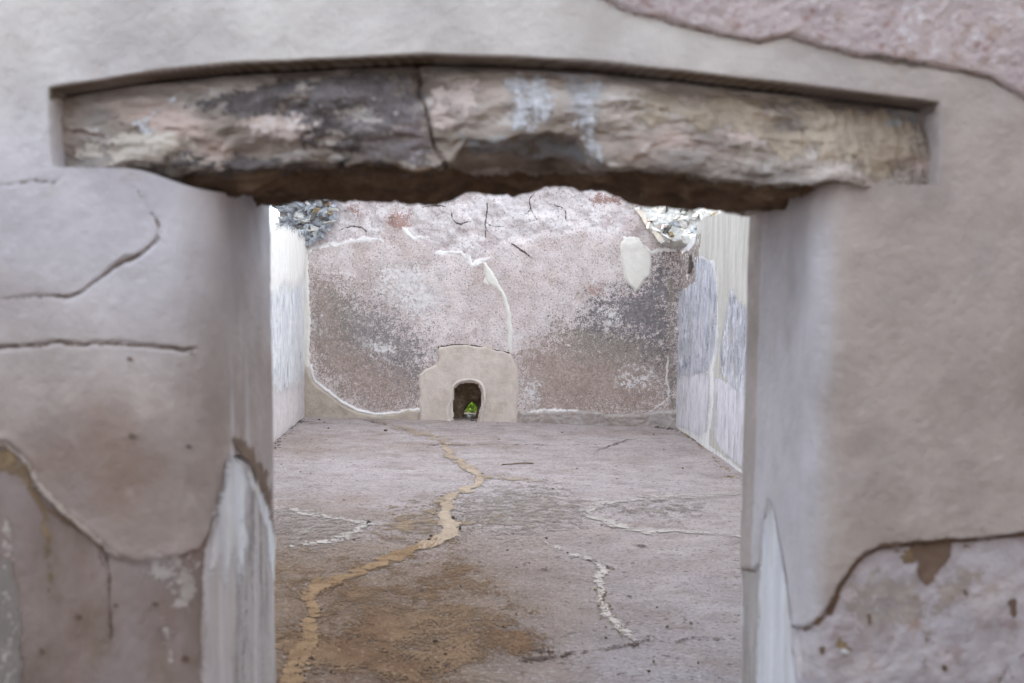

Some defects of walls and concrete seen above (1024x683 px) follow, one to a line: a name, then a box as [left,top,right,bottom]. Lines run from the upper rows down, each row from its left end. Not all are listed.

spalling [603,0,1024,98]
leakage [244,111,322,146]
leakage [424,68,608,171]
leakage [625,82,929,182]
crack [15,191,160,299]
leakage [589,192,623,207]
crack [0,341,196,354]
peeling [623,234,747,469]
peeling [0,441,276,683]
crack [274,420,635,683]
crack [519,541,734,661]
spalling [741,500,1024,683]